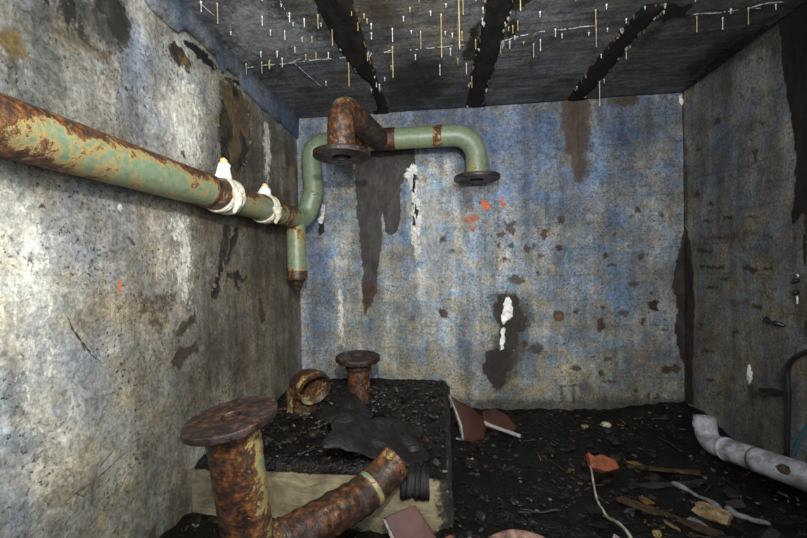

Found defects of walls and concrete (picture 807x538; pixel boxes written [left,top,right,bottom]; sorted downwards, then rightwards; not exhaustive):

leakage [59,0,131,60]
spalling [169,40,218,74]
leakage [678,2,807,265]
leakage [355,149,415,313]
corrosion [462,199,491,231]
spalling [500,275,525,350]